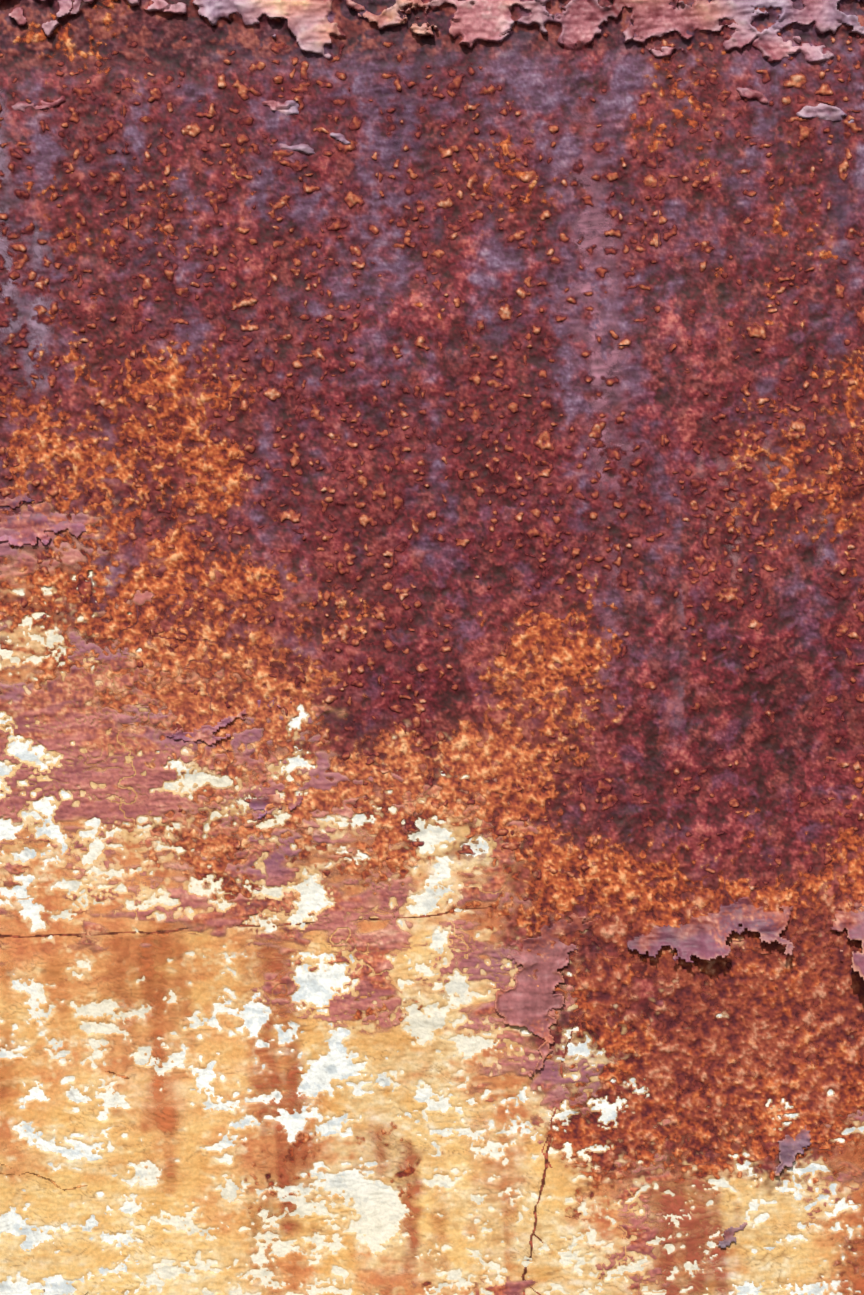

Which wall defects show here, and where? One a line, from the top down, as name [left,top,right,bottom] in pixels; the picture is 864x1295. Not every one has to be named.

peeling [0,0,94,37]
corrosion [13,14,320,309]
corrosion [368,42,593,319]
peeling [126,0,864,63]
corrosion [547,31,771,264]
peeling [796,103,854,123]
corrosion [672,339,864,703]
crack [0,927,189,940]
crack [233,920,315,928]
peeling [0,489,864,1295]
crack [359,903,510,921]
crack [521,1011,579,1295]